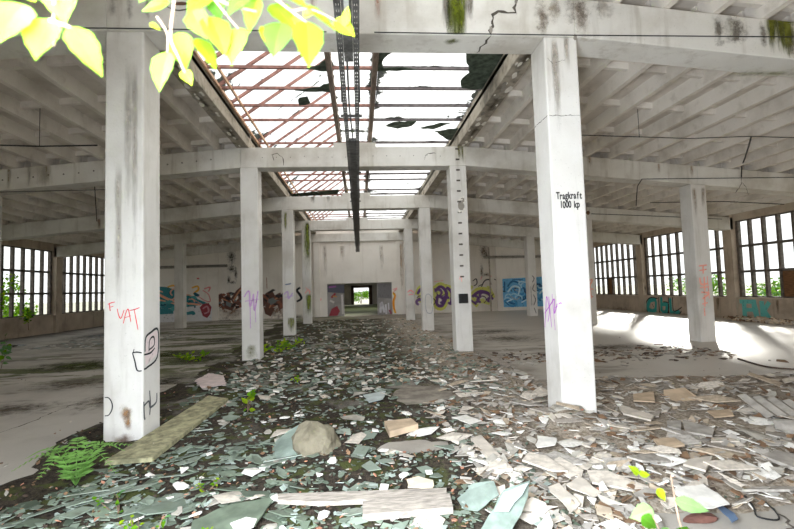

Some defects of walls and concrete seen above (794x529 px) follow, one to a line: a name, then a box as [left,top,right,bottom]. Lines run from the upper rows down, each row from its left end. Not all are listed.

damp [443,0,472,33]
crack [477,0,518,53]
damp [760,20,794,52]
crack [772,507,794,529]